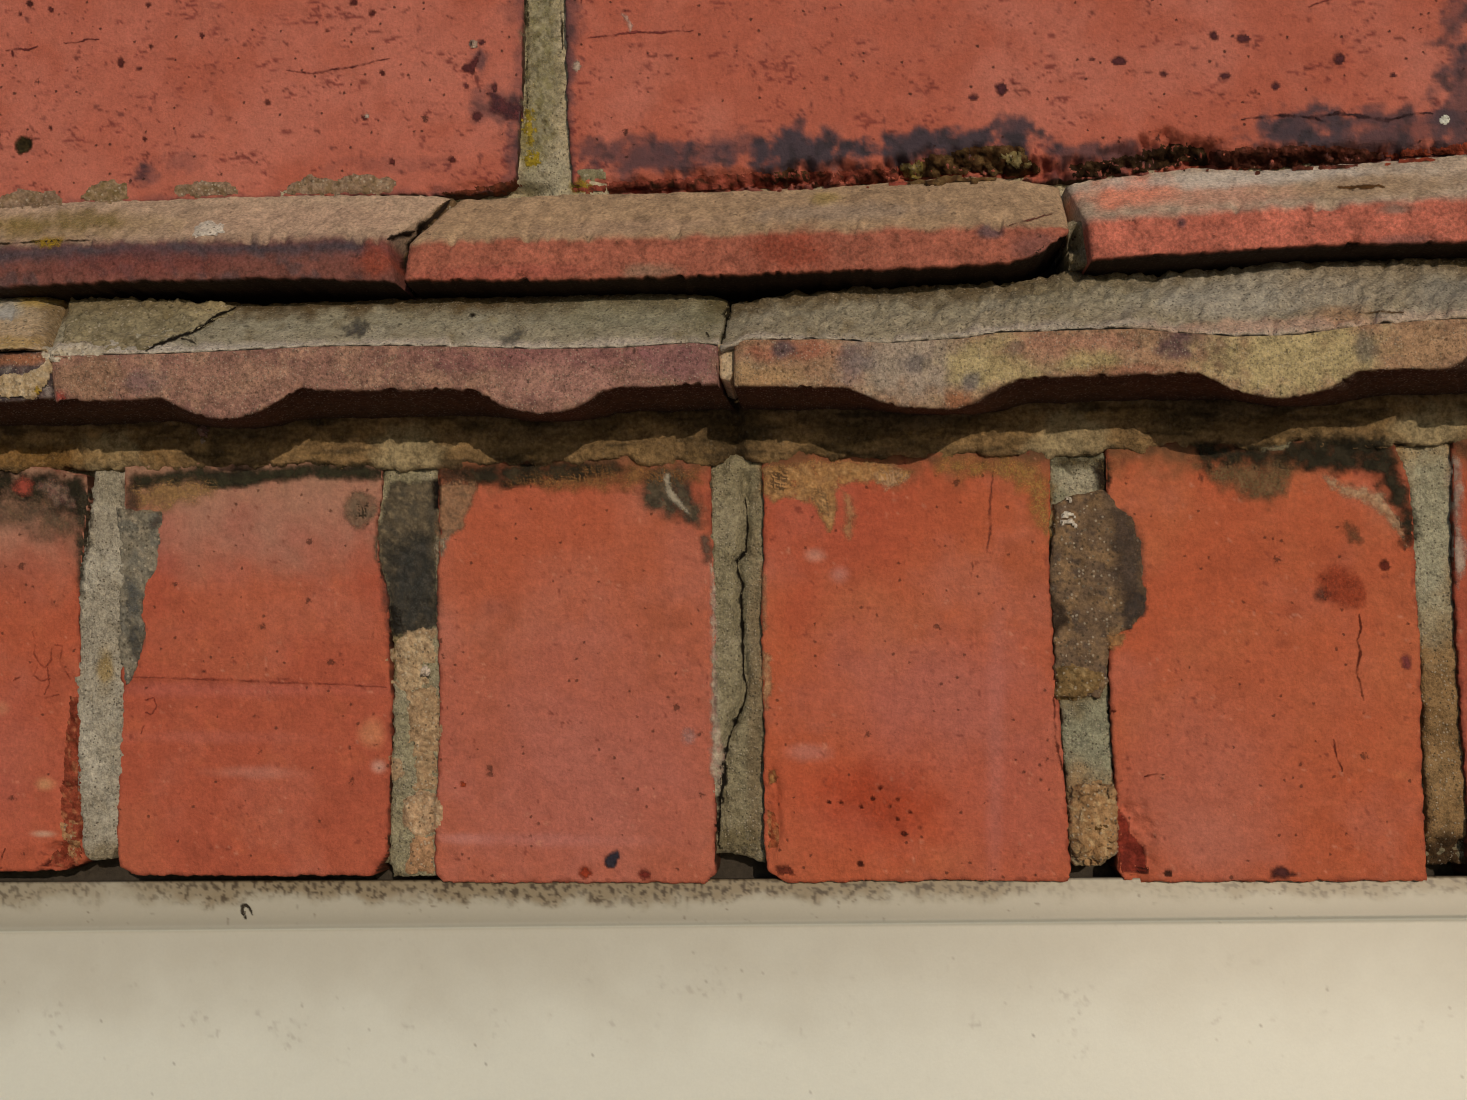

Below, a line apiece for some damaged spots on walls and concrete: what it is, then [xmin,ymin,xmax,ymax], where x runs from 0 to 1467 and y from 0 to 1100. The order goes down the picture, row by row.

crack [5,38,99,56]
crack [524,0,694,108]
crack [387,200,450,298]
crack [145,305,238,351]
water stain [0,480,93,593]
water stain [1198,443,1291,500]
water stain [1327,479,1402,535]
crack [715,498,749,843]
peeling [1053,663,1104,701]
peeling [385,627,443,874]
peeling [1067,780,1149,874]